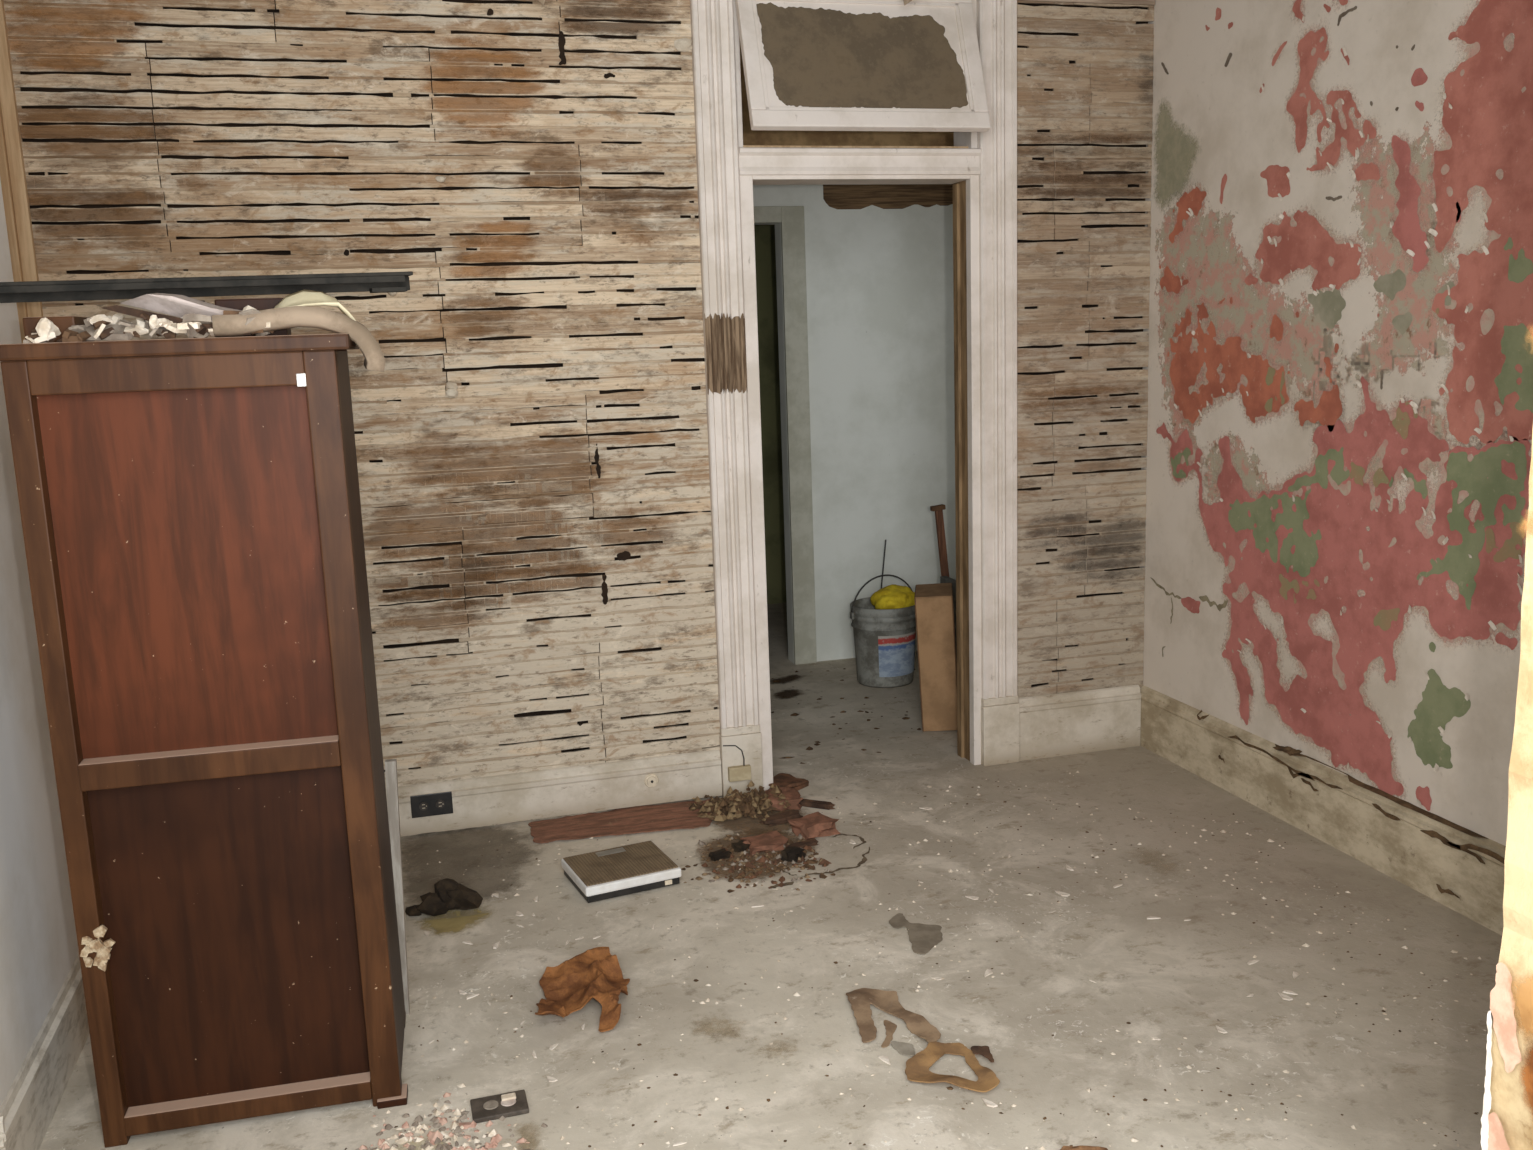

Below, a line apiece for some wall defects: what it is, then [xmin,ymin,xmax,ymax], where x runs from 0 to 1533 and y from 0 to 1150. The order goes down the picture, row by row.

damp [7,0,143,69]
damp [566,0,669,34]
damp [426,38,541,137]
flaking render [739,36,954,146]
damp [20,97,176,237]
damp [523,153,688,213]
damp [456,221,532,277]
peeling [1154,0,1533,864]
damp [364,434,665,628]